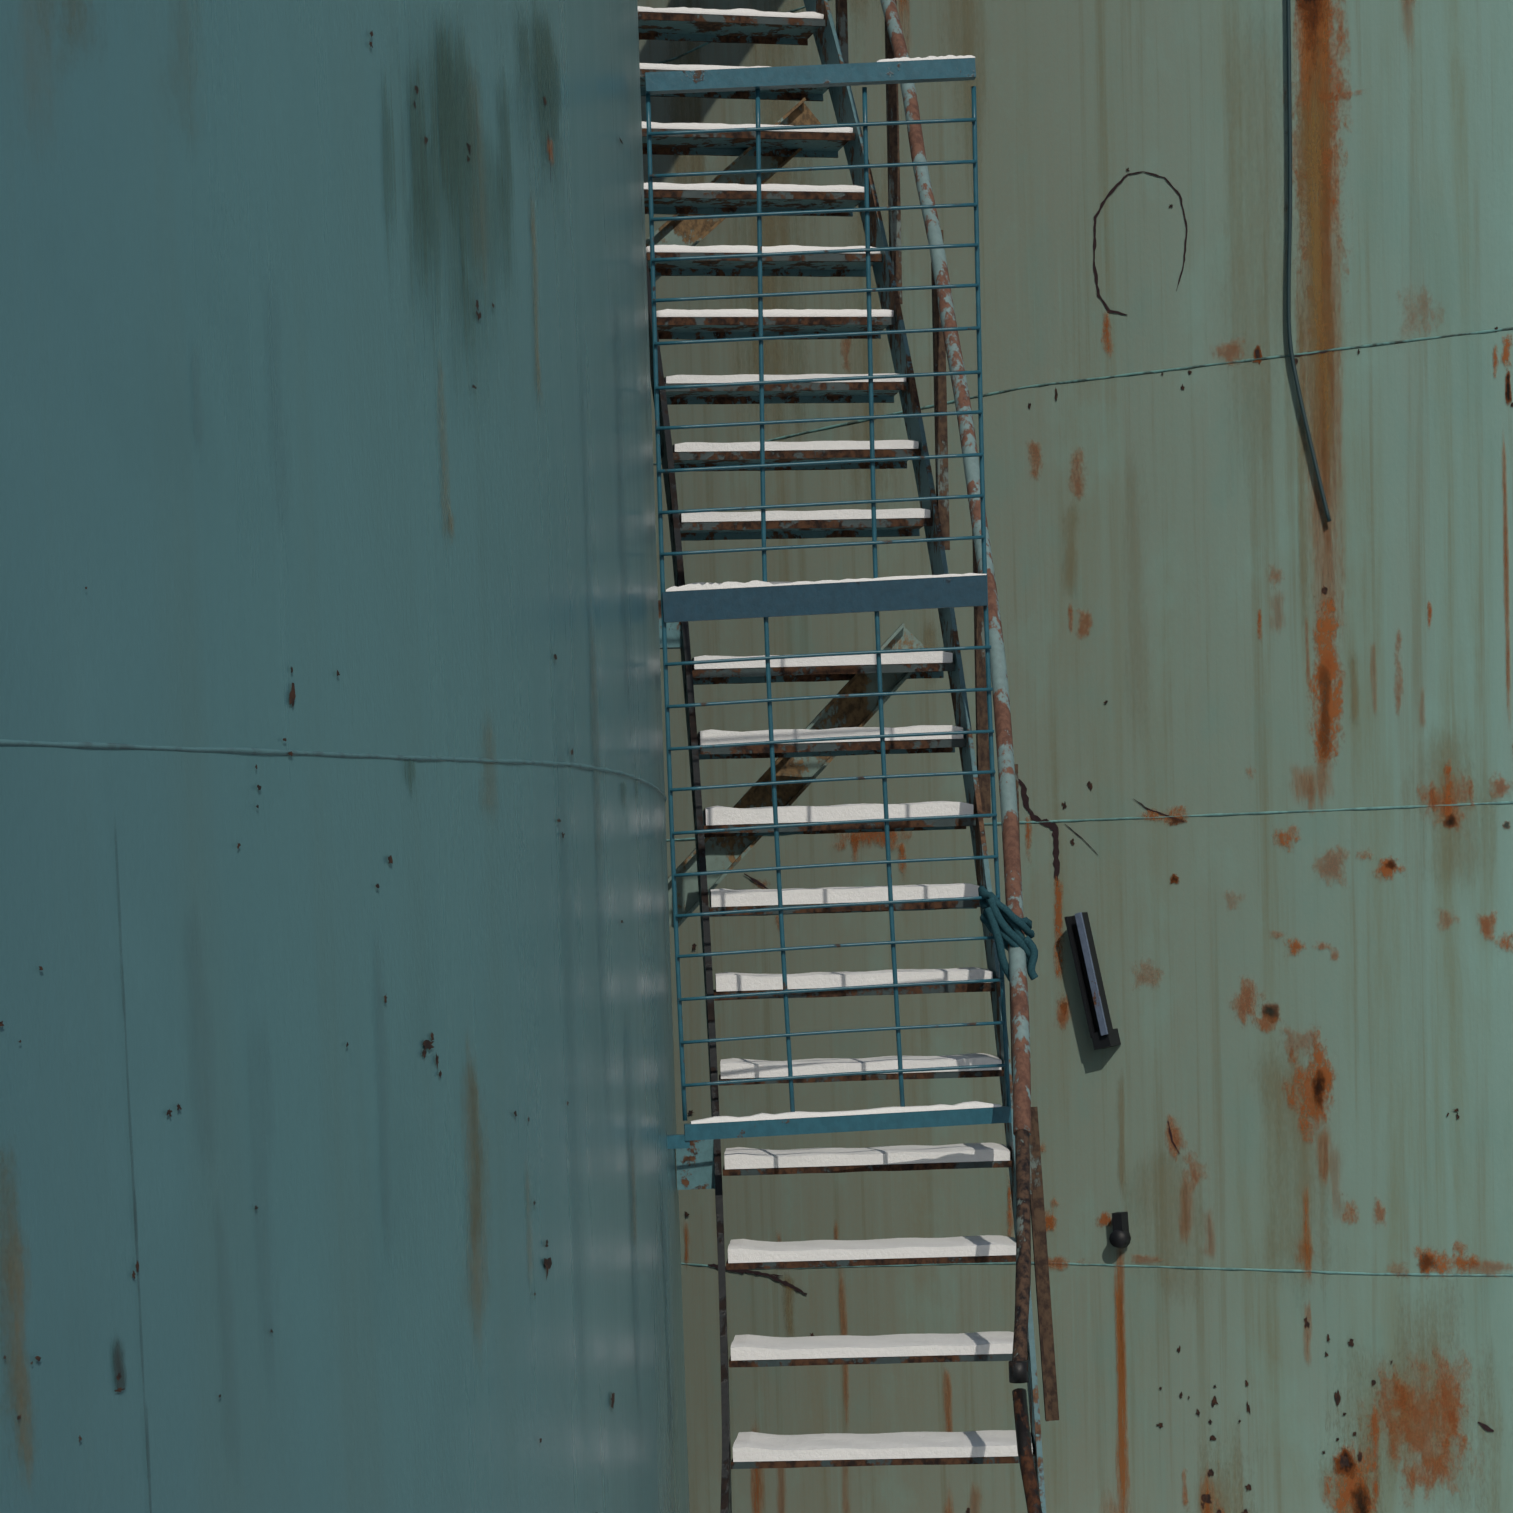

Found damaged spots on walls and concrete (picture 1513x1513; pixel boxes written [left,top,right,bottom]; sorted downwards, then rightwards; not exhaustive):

corrosion [1292,0,1346,495]
corrosion [1301,585,1343,799]
corrosion [1425,766,1471,827]
corrosion [1364,855,1401,879]
corrosion [1288,940,1324,955]
corrosion [1481,915,1512,949]
corrosion [1238,982,1279,1031]
corrosion [1286,1032,1332,1176]
corrosion [1325,1358,1465,1513]